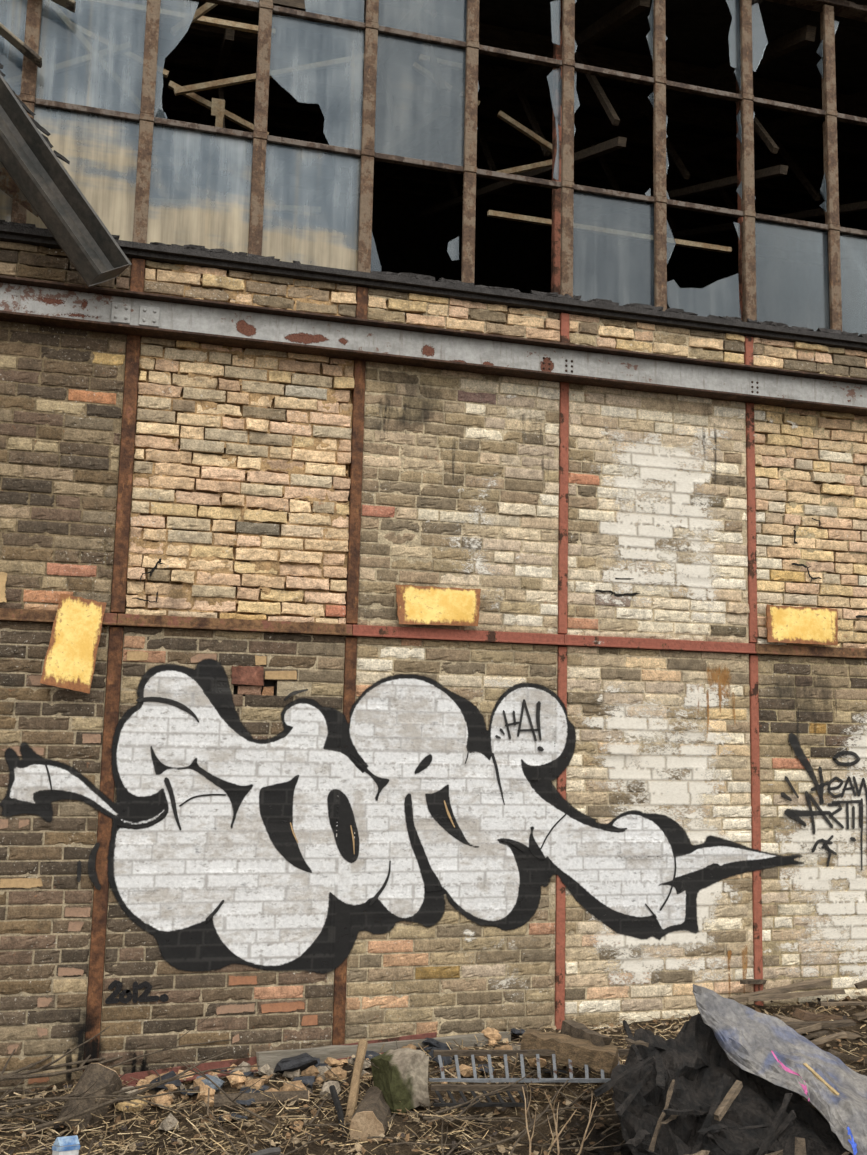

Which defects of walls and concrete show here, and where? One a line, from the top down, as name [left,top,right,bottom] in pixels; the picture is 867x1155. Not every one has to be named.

crack [132,558,164,603]
crack [595,578,640,597]
crack [791,518,826,583]
corrosion [698,667,735,734]